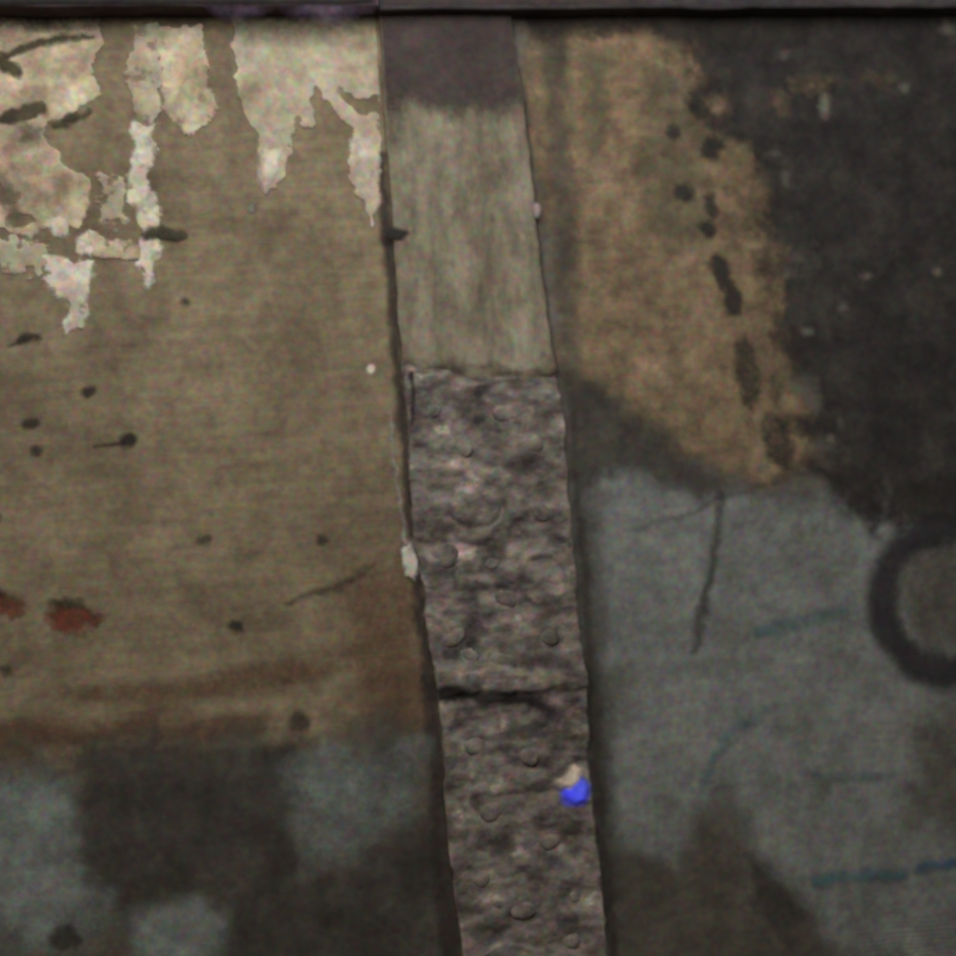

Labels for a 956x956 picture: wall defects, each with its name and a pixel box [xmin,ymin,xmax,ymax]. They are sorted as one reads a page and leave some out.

peeling [0,16,220,334]
peeling [229,15,382,228]
crack [380,153,554,956]
leakage [382,0,956,956]
crack [696,517,719,642]
leakage [0,712,445,956]